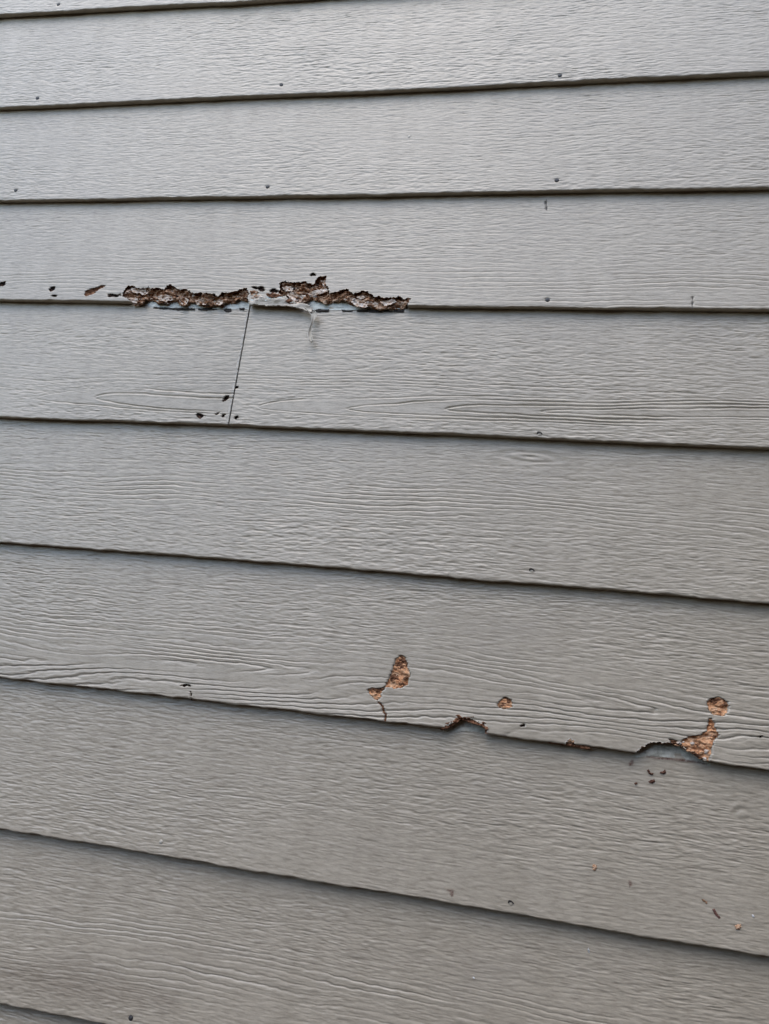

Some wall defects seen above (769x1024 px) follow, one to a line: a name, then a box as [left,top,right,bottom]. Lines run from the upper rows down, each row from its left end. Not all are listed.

spalling [85,285,223,305]
peeling [249,273,328,343]
peeling [349,296,397,308]
peeling [368,655,410,700]
peeling [497,697,513,709]
spalling [440,715,489,734]
spalling [630,697,728,785]